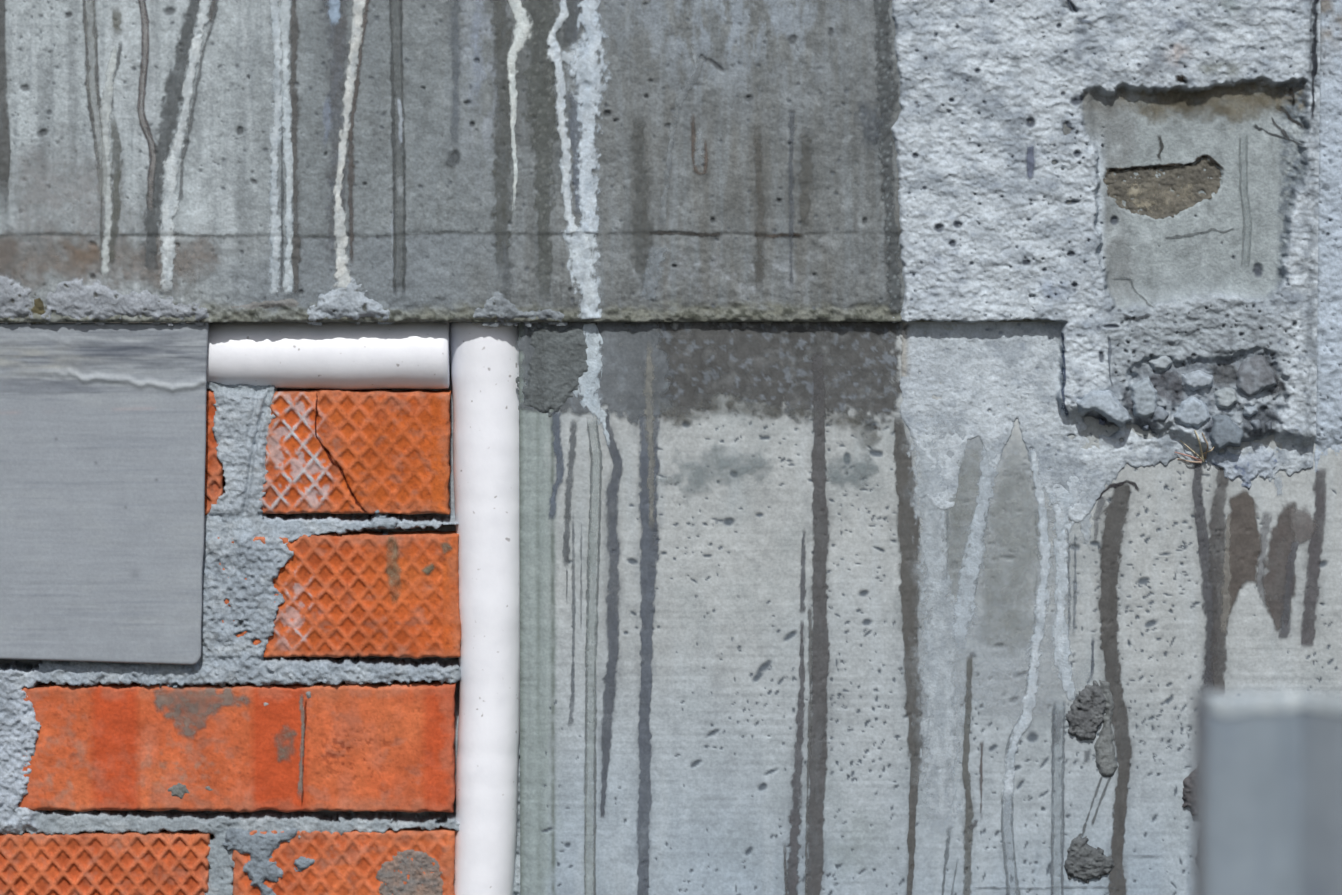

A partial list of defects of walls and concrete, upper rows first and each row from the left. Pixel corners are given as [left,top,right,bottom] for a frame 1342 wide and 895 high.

leakage [0,0,218,290]
efflorescence [268,0,301,294]
leakage [323,0,370,288]
leakage [389,0,407,289]
leakage [447,151,459,166]
spalling [1103,158,1222,219]
crack [315,394,365,511]
leakage [472,0,1132,895]
leakage [1192,464,1326,694]